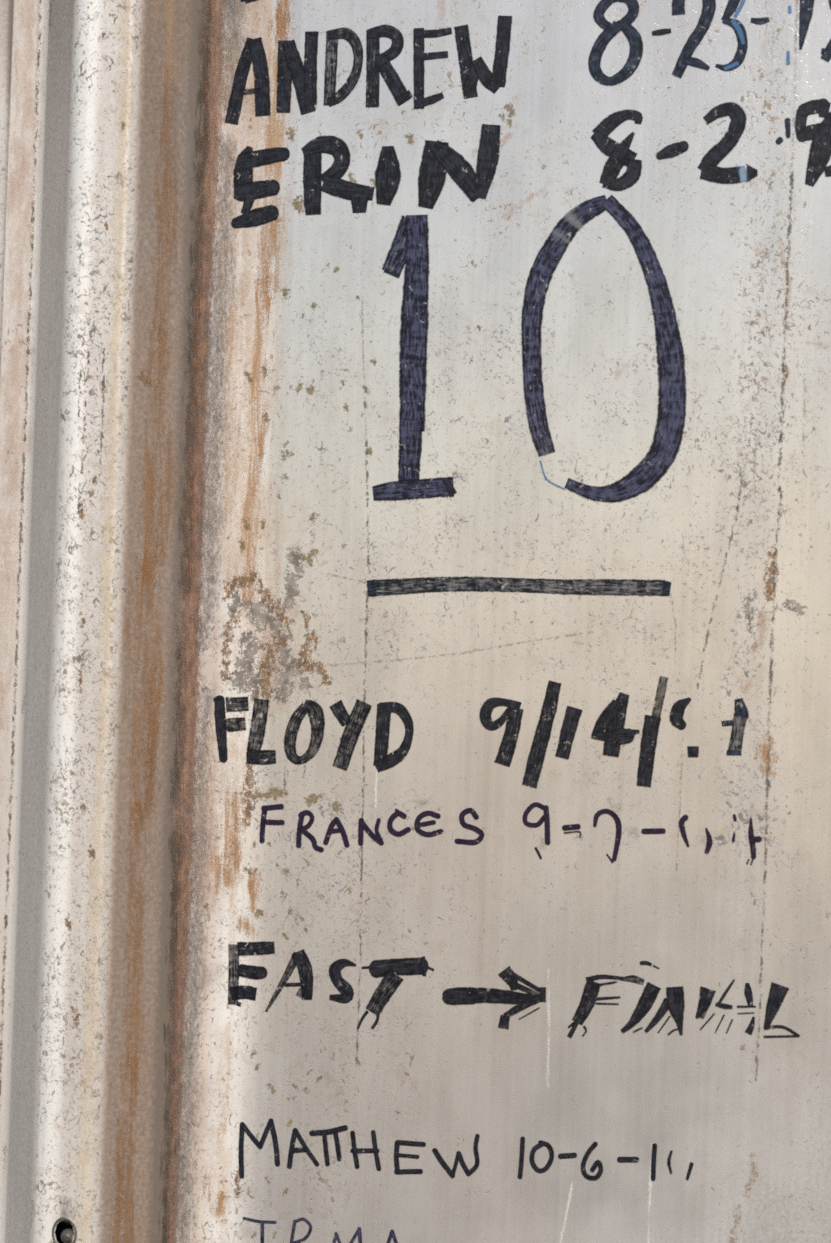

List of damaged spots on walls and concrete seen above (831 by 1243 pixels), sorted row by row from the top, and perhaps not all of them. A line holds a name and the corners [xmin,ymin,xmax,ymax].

rust [275,0,289,41]
rust [268,56,295,178]
rust [218,219,333,704]
rust [167,0,225,1243]
rust [212,762,288,933]
rust [304,793,342,814]
rust [216,1171,242,1214]